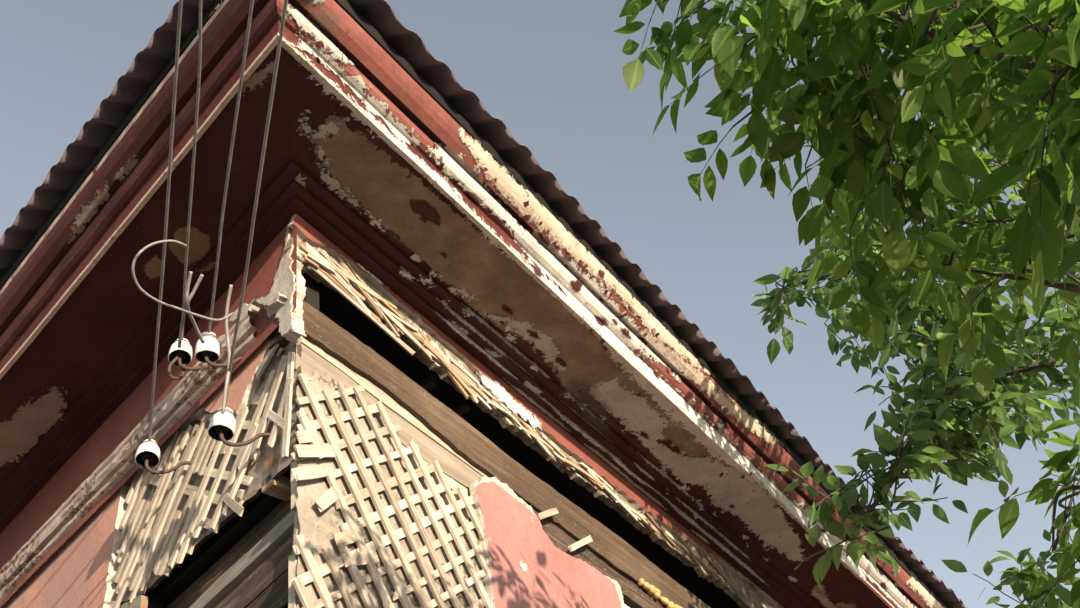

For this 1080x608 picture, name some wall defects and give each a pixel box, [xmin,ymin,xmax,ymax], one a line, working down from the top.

peeling [67,154,139,244]
peeling [144,226,216,280]
peeling [281,0,943,608]
peeling [0,386,68,467]
flaking render [109,342,492,608]